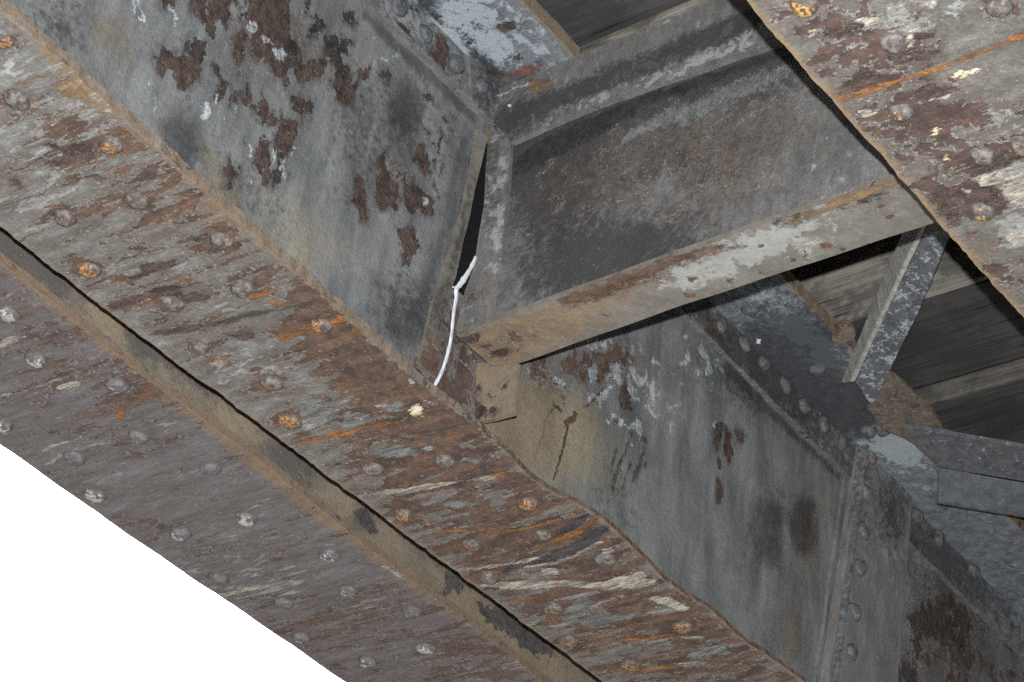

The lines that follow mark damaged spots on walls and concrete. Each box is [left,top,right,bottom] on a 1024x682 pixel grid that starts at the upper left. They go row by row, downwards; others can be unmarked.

corrosion [428,33,450,71]
corrosion [835,31,1024,102]
corrosion [788,179,899,225]
corrosion [715,448,731,504]
corrosion [898,595,971,682]